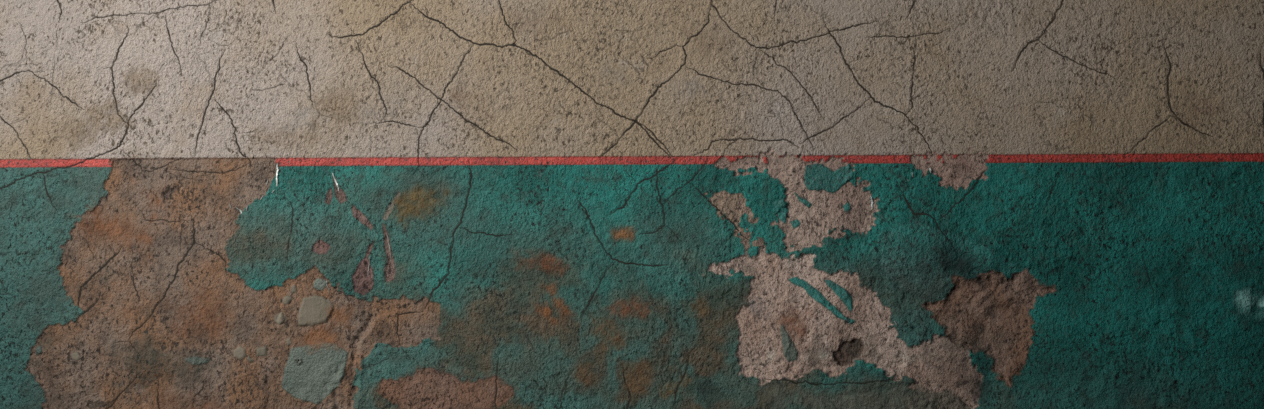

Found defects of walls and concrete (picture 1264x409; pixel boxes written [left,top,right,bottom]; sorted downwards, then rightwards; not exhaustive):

peeling [25,158,441,409]
crack [328,0,949,321]
peeling [704,147,1056,409]
crack [1012,0,1112,77]
crack [1124,47,1213,155]
crack [1256,53,1264,126]